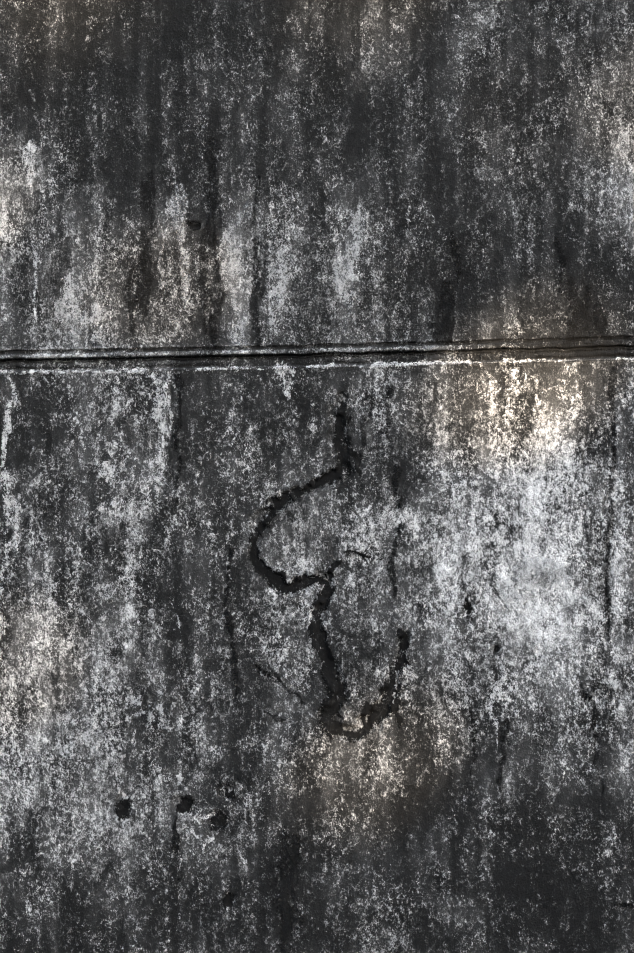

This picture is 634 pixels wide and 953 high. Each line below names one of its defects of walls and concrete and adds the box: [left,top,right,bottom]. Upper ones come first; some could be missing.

leakage [0,203,13,244]
leakage [22,139,37,188]
leakage [31,241,39,323]
leakage [198,138,226,349]
leakage [249,175,266,347]
leakage [427,232,464,345]
leakage [553,237,608,346]
leakage [617,132,634,206]
crack [248,397,409,743]